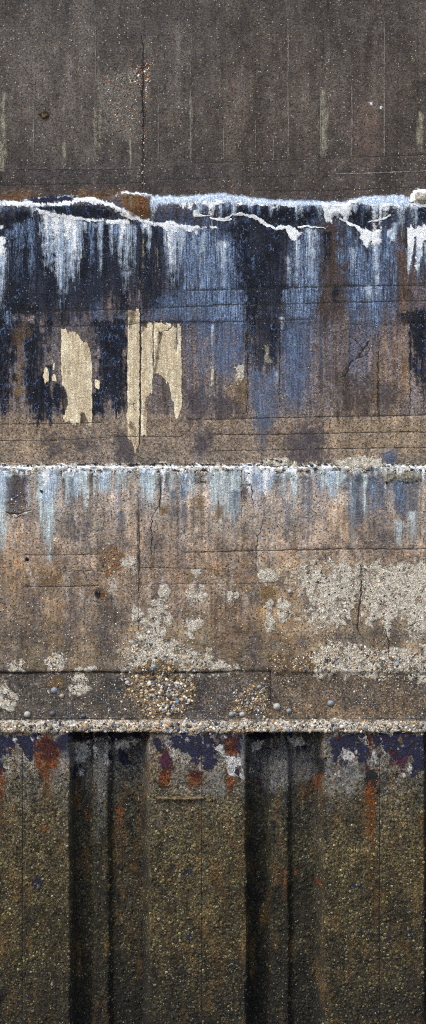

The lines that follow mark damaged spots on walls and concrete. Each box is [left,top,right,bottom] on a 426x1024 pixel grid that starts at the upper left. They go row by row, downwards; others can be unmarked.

crack [139,35,147,193]
rust [123,196,151,219]
water stain [0,191,426,454]
peeling [0,307,426,518]
water stain [0,470,11,543]
water stain [36,468,109,557]
water stain [139,466,194,512]
water stain [208,427,417,541]
rust [33,733,62,787]
rust [158,748,174,788]
rust [188,770,203,787]
rust [223,734,239,793]